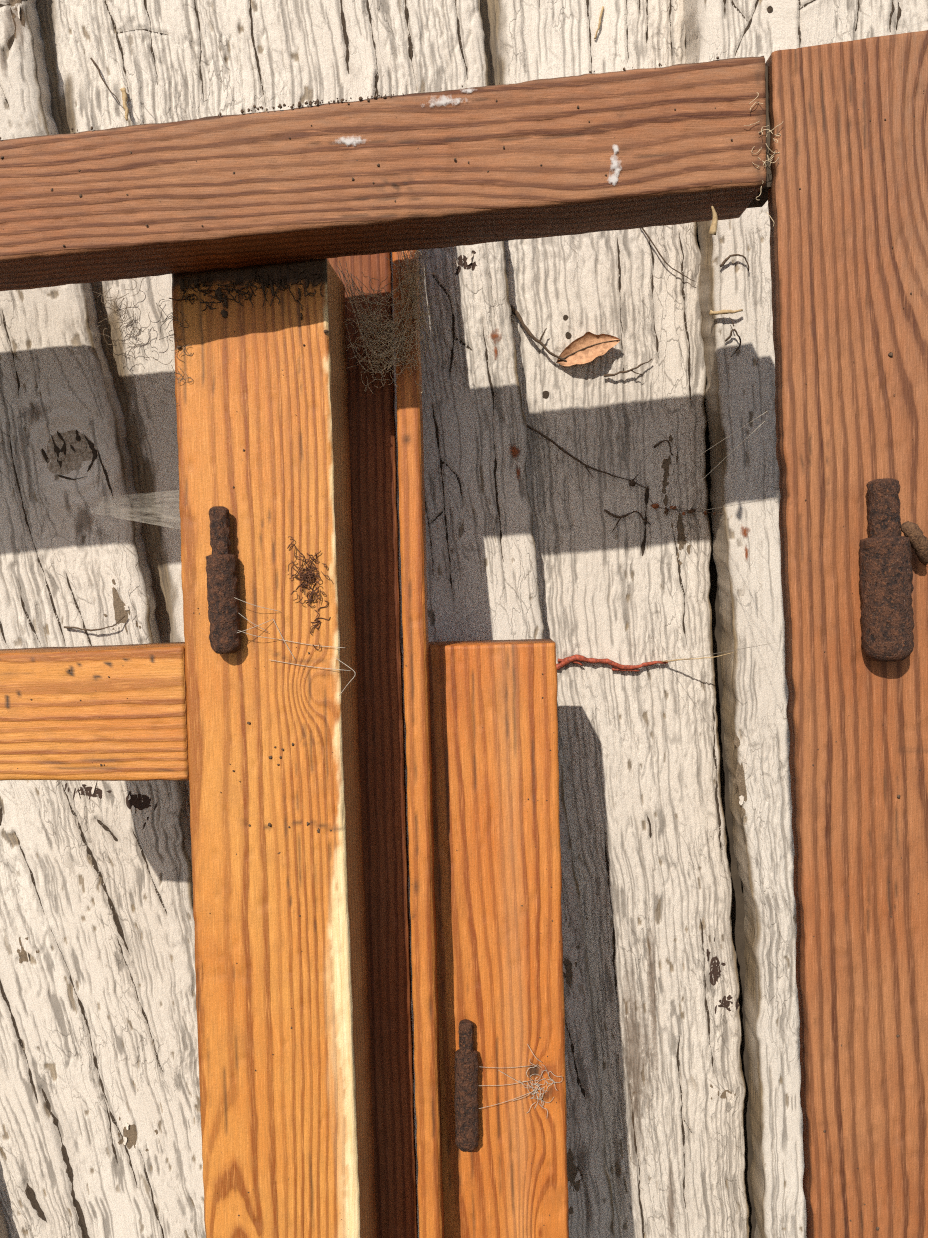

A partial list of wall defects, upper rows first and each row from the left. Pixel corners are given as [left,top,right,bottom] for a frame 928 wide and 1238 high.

crack [713,706,722,861]
crack [676,915,713,1208]